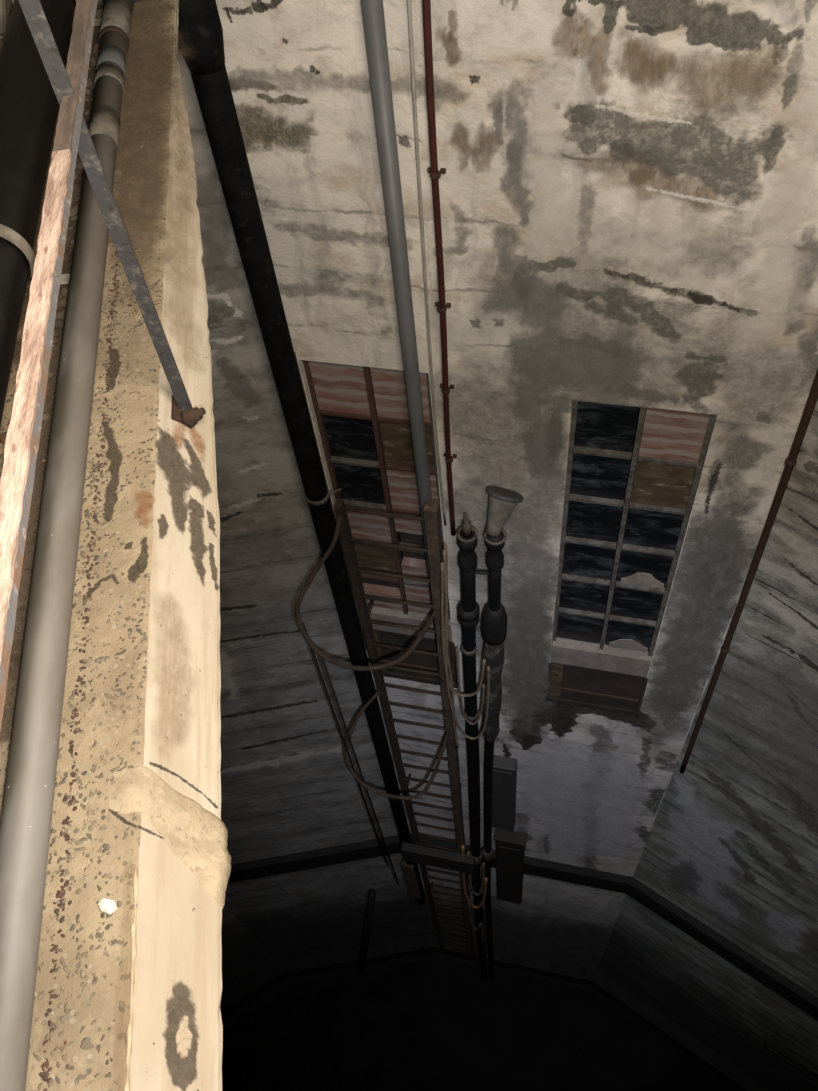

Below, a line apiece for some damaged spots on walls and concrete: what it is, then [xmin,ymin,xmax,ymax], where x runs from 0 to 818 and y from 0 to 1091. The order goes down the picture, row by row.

leakage [554,9,604,89]
leakage [565,37,803,211]
leakage [441,93,818,888]
leakage [164,983,198,1091]